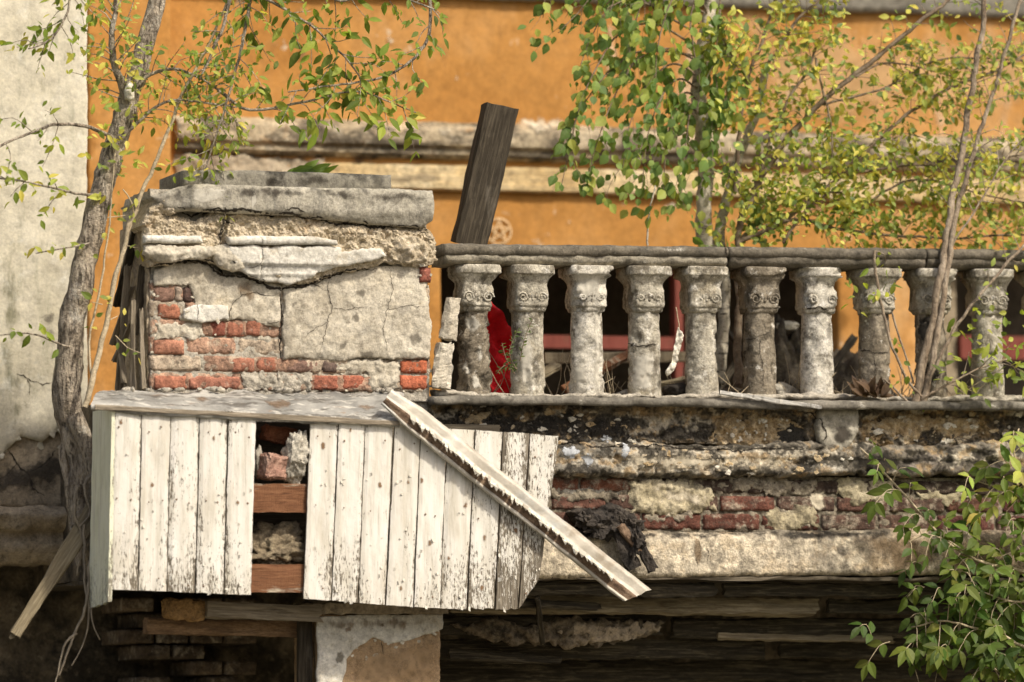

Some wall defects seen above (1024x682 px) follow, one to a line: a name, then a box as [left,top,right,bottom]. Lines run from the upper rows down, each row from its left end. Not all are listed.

spalling [130,200,176,233]
crack [146,207,430,358]
spalling [152,282,194,319]
spalling [150,334,184,357]
spalling [210,318,266,340]
spalling [154,352,368,393]
damp [451,409,644,442]
damp [921,428,950,445]
flaking render [0,429,61,491]